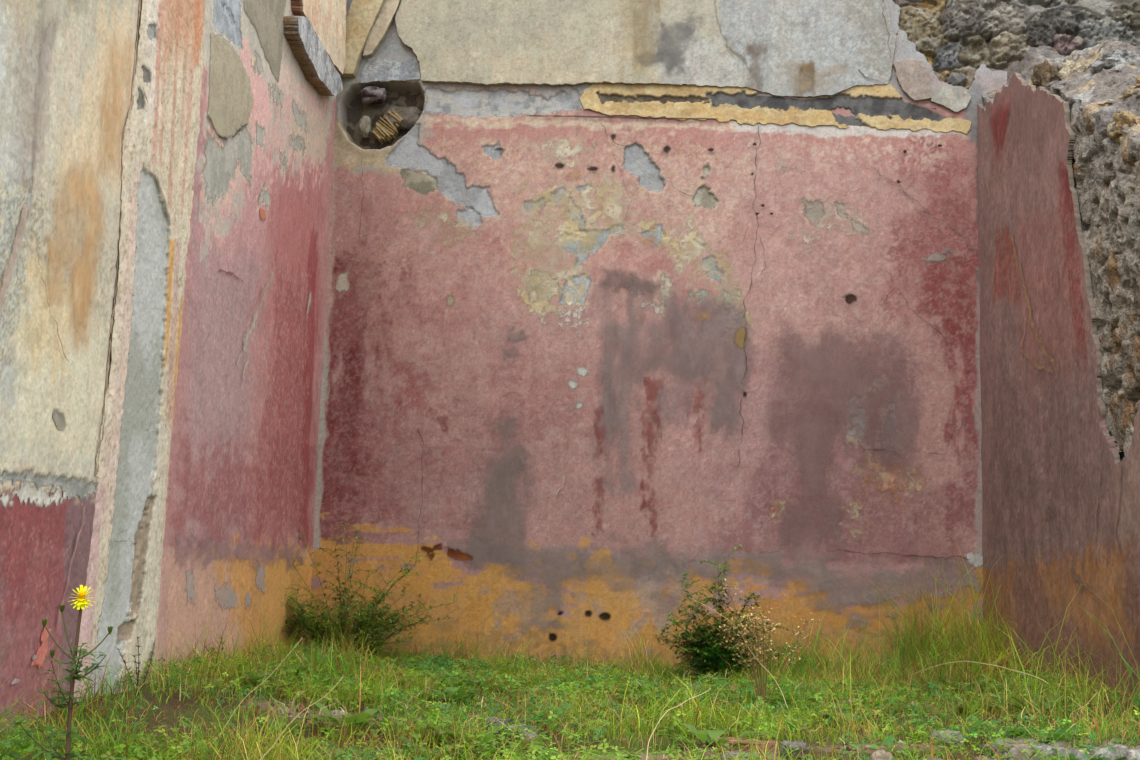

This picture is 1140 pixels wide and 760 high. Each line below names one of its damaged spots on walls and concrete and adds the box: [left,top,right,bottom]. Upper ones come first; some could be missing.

peeling [202,121,270,209]
peeling [213,0,307,172]
spalling [359,56,583,229]
peeling [512,139,753,337]
spalling [597,91,947,127]
peeling [0,469,98,506]
peeling [53,410,66,430]
peeling [89,168,170,698]
damp [602,270,657,441]
damp [652,299,748,429]
damp [705,419,983,628]
peeling [31,625,52,669]